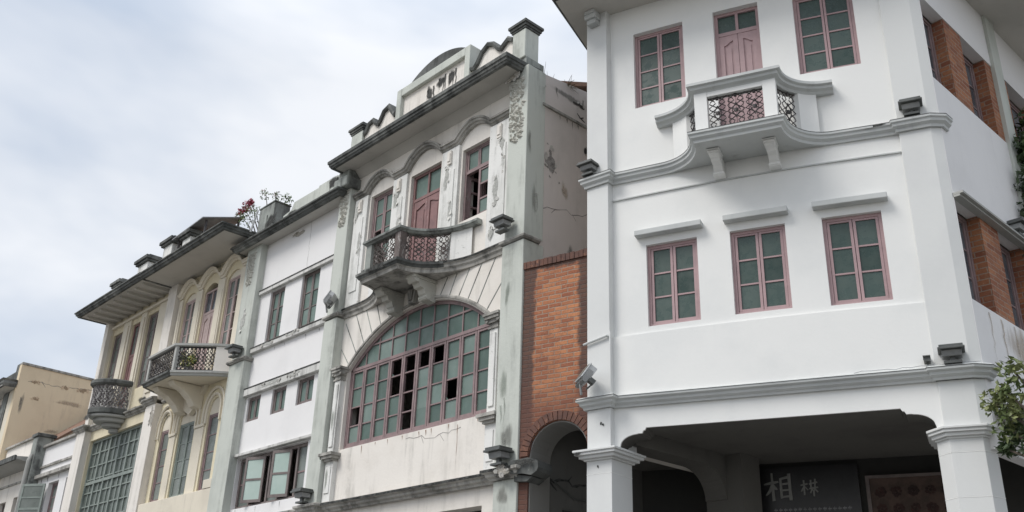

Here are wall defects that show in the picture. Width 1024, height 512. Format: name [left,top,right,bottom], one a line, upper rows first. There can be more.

spalling [544,143,557,177]